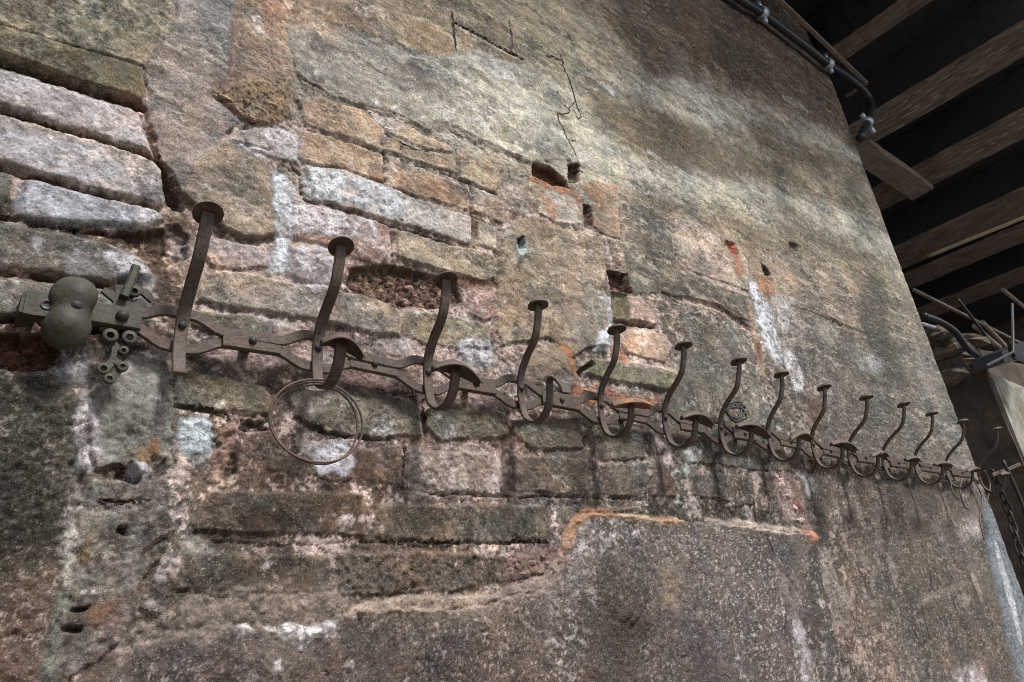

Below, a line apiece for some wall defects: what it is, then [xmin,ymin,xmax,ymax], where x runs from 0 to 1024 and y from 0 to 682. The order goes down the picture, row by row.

crack [451,13,583,174]
spalling [346,263,461,309]
water stain [676,237,804,391]